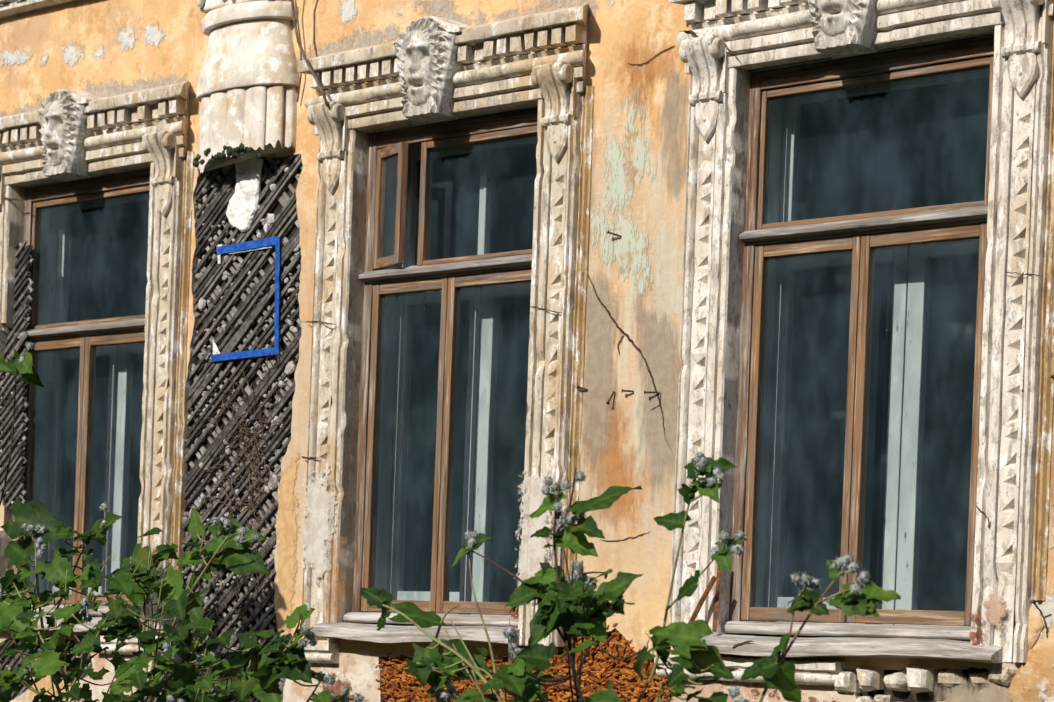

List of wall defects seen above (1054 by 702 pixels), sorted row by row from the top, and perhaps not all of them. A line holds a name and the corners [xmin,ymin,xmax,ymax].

peeling [337,0,357,24]
peeling [0,48,49,67]
peeling [62,39,105,67]
peeling [115,20,166,53]
peeling [590,90,661,306]
crack [588,275,672,451]
spalling [164,154,338,695]
flaking render [1023,590,1054,649]
spalling [144,656,180,702]
spalling [278,678,286,702]